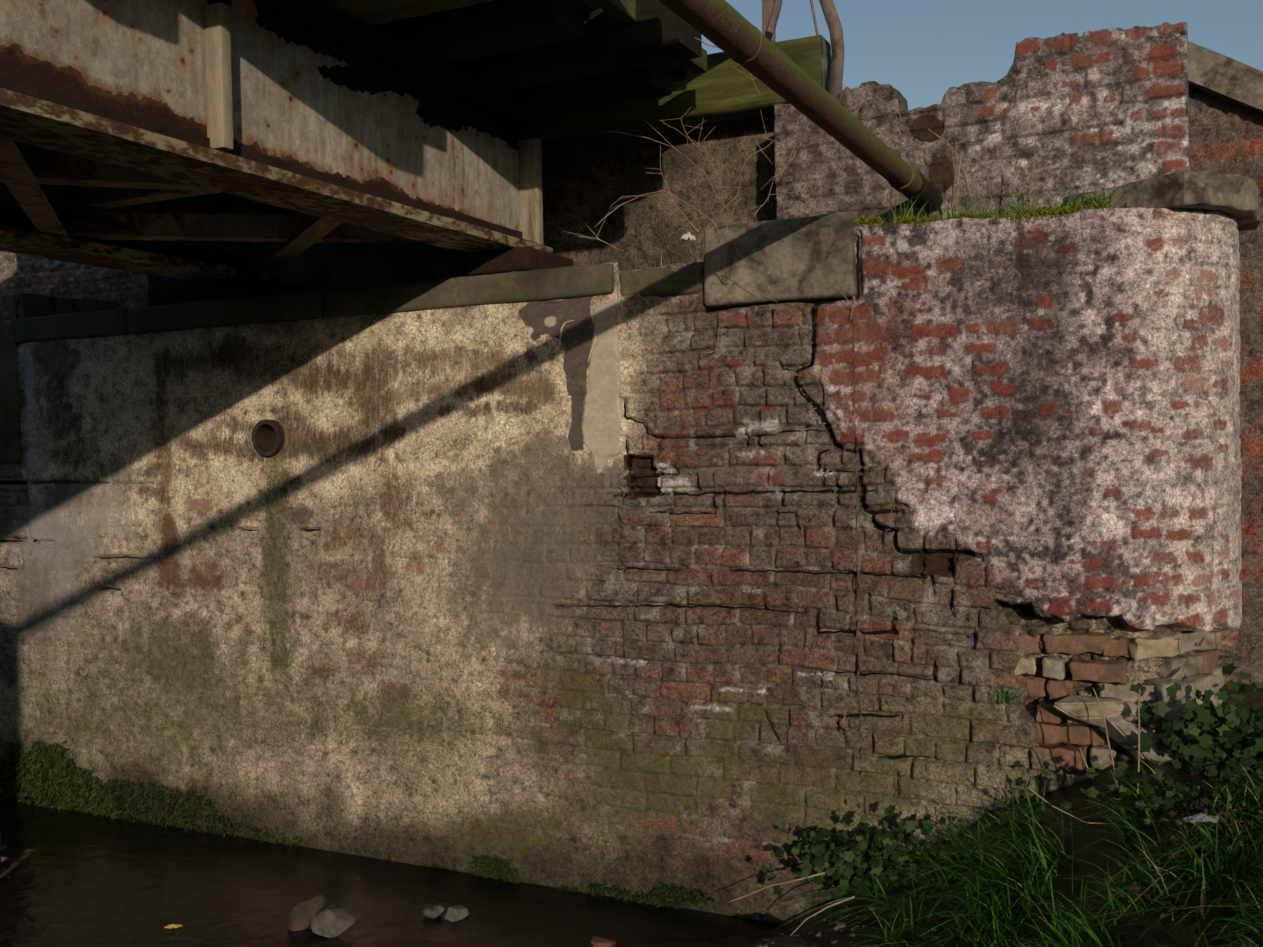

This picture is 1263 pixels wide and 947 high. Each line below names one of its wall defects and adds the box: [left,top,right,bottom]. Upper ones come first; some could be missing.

peeling [0,42,207,137]
peeling [255,1,527,150]
peeling [233,138,464,214]
crack [554,235,981,680]
peeling [816,304,946,487]
peeling [905,293,1053,441]
peeling [1101,400,1164,433]
peeling [1171,270,1231,410]
peeling [1182,418,1228,472]
spalling [1013,507,1243,787]
crack [829,713,900,732]
crack [878,755,927,791]